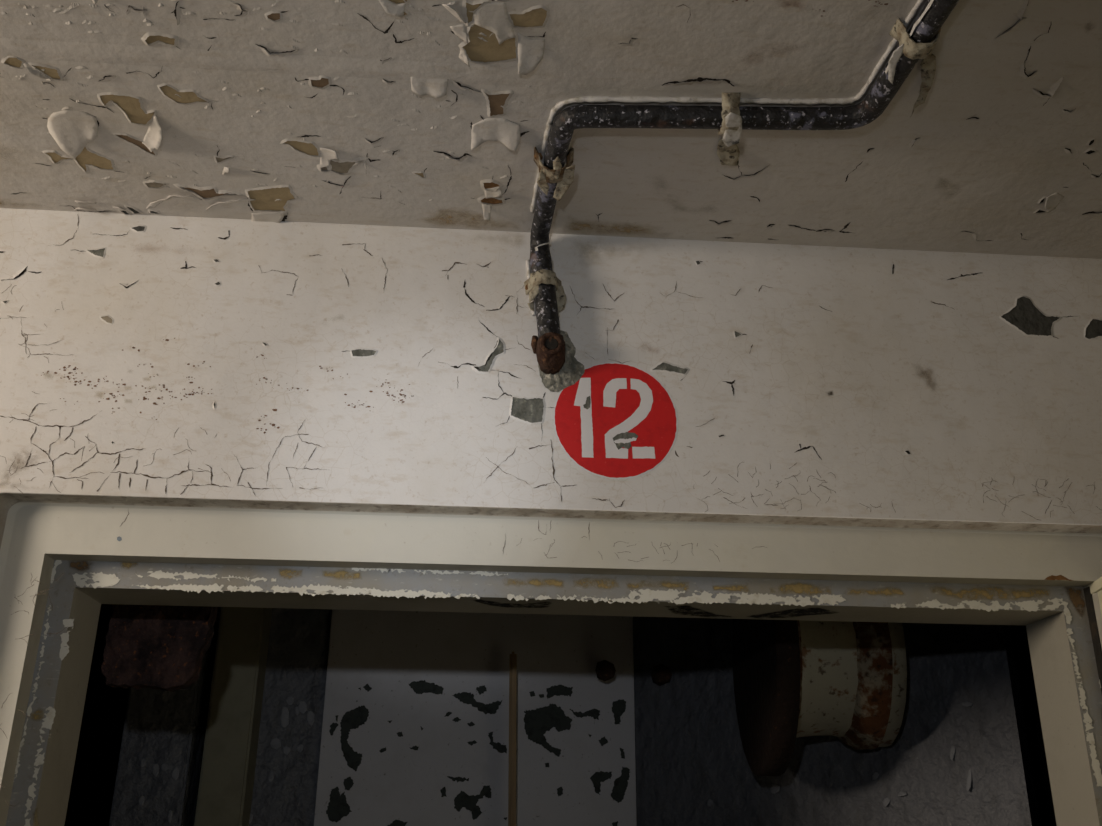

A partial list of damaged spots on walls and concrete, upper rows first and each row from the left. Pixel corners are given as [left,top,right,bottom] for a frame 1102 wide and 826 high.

peeling [357,0,550,87]
peeling [1,56,176,182]
crack [0,266,74,362]
crack [119,280,138,288]
spalling [999,295,1073,339]
spalling [451,321,554,441]
crack [1,391,325,525]
peeling [135,570,480,599]
peeling [507,589,846,607]
peeling [326,705,369,823]
peeling [524,685,626,767]
peeling [891,598,1102,787]